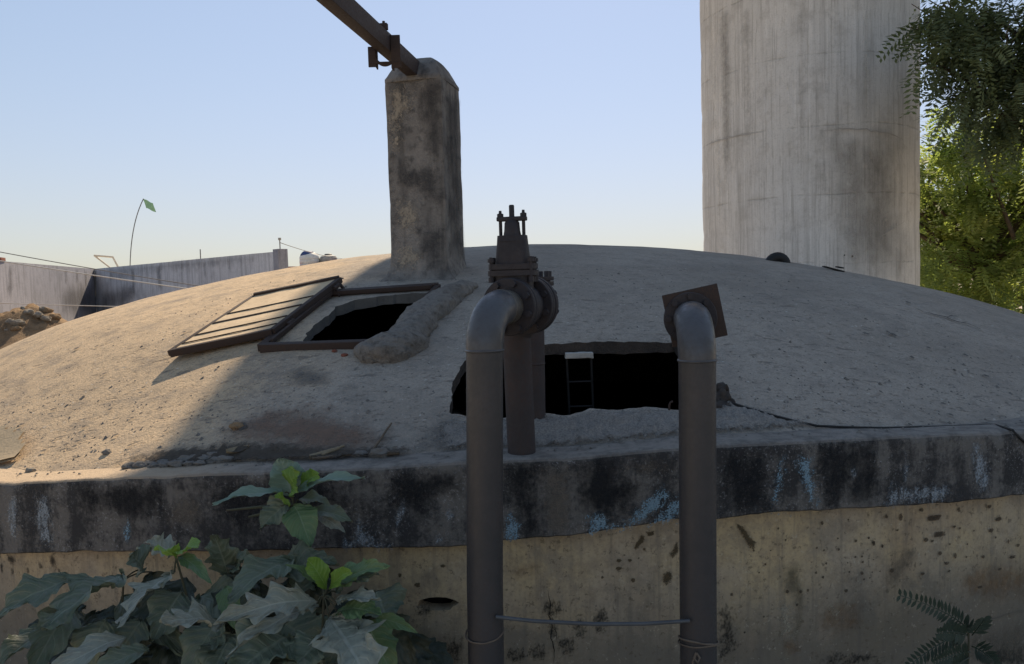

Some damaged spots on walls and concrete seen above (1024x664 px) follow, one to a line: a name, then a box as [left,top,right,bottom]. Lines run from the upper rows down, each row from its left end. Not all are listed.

water stain [450,104,458,163]
water stain [214,483,335,525]
water stain [818,443,878,505]
water stain [891,471,946,504]